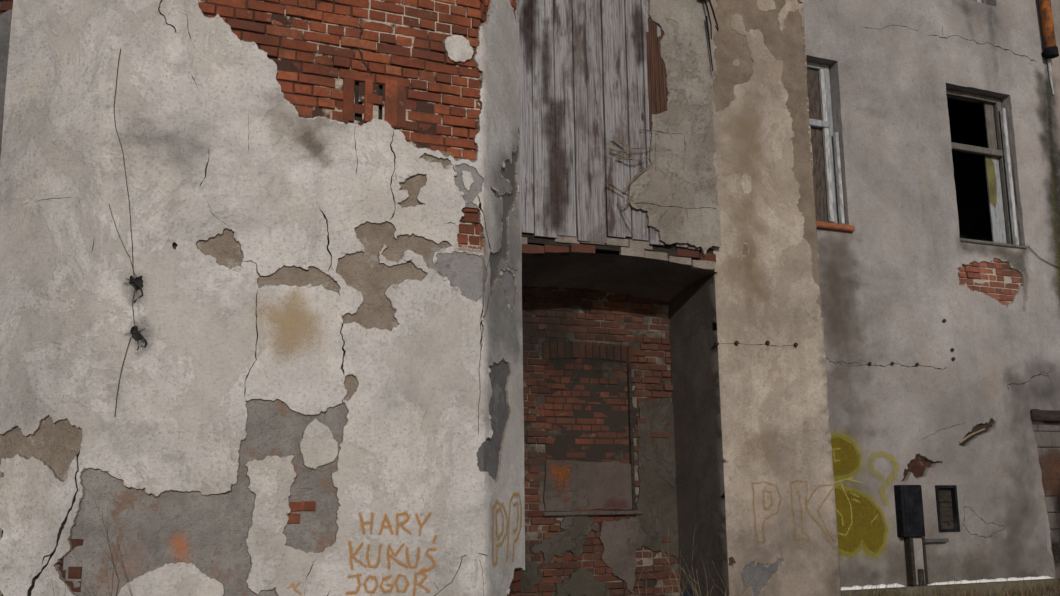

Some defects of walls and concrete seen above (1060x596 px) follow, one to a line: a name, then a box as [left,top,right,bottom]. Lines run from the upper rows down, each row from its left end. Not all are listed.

spalling [197,0,519,331]
leakage [522,0,568,228]
leakage [634,10,644,60]
peeling [713,0,822,320]
crack [865,25,1036,62]
leakage [1039,74,1060,256]
crack [2,450,80,596]
spalling [0,416,83,481]
spalling [52,369,358,596]
leakage [271,295,312,349]
peeling [477,360,509,481]
crack [826,358,947,370]